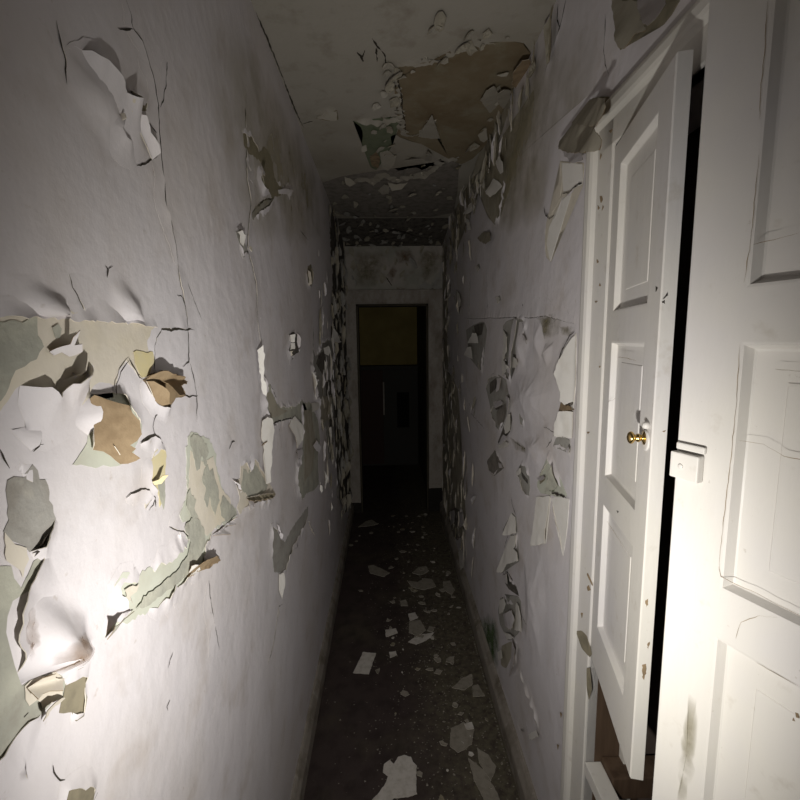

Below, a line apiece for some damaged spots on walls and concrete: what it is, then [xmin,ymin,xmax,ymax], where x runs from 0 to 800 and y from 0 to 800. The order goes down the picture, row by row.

crack [56,20,69,82]
peeling [66,37,161,170]
crack [119,1,201,411]
crack [256,13,313,127]
peeling [544,97,610,262]
peeling [0,295,187,510]
peeling [101,36,536,640]
peeling [516,332,577,556]
peeling [0,462,98,800]
peeling [496,499,539,740]